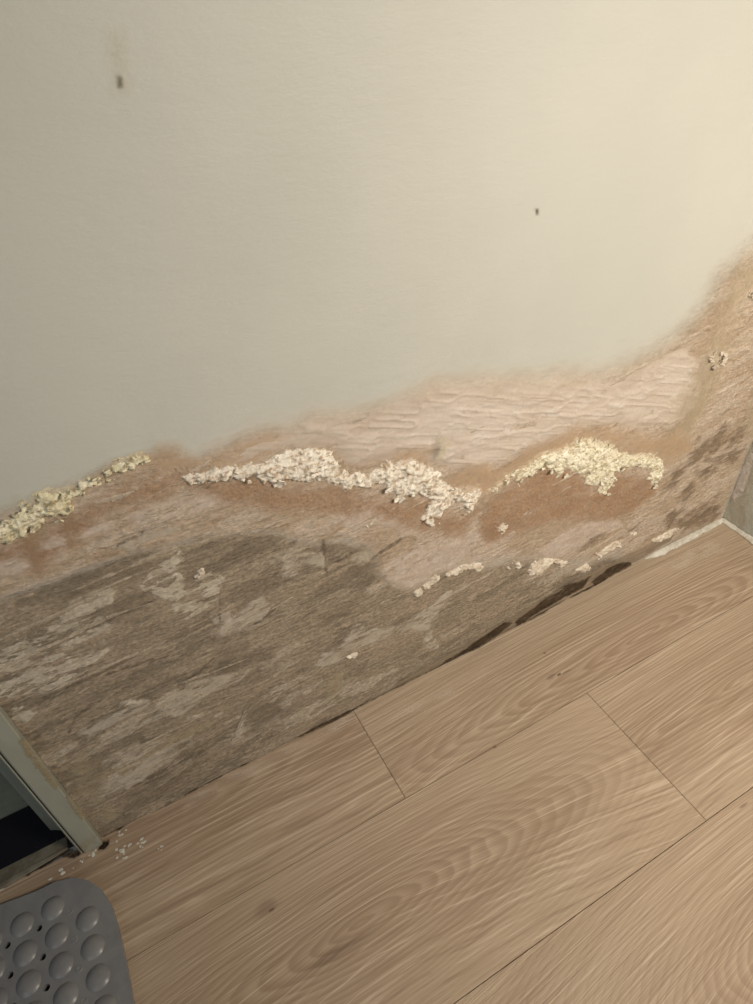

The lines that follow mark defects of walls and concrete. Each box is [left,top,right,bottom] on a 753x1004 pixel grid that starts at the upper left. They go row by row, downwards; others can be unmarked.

leakage [0,333,753,742]
flaking render [0,247,753,837]